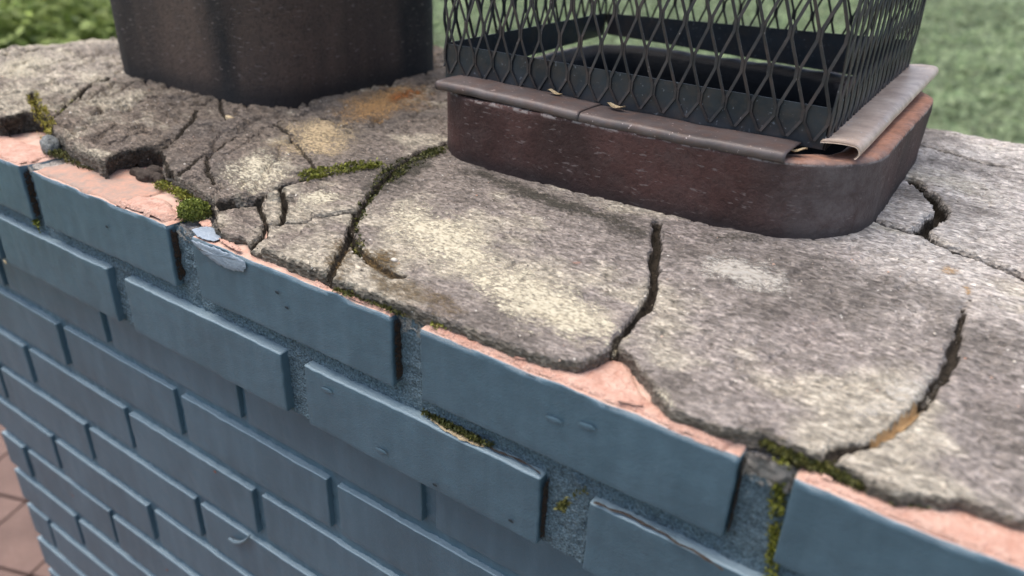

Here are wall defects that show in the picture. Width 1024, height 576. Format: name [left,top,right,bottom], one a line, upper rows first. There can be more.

crack [29,78,110,137]
spalling [0,135,179,223]
peeling [191,219,246,272]
crack [160,100,316,251]
spalling [313,280,390,314]
crack [326,144,448,288]
crack [609,224,662,361]
crack [908,182,993,268]
spalling [428,325,735,452]
crack [822,300,971,470]
crack [489,447,540,474]
spalling [742,449,1024,568]